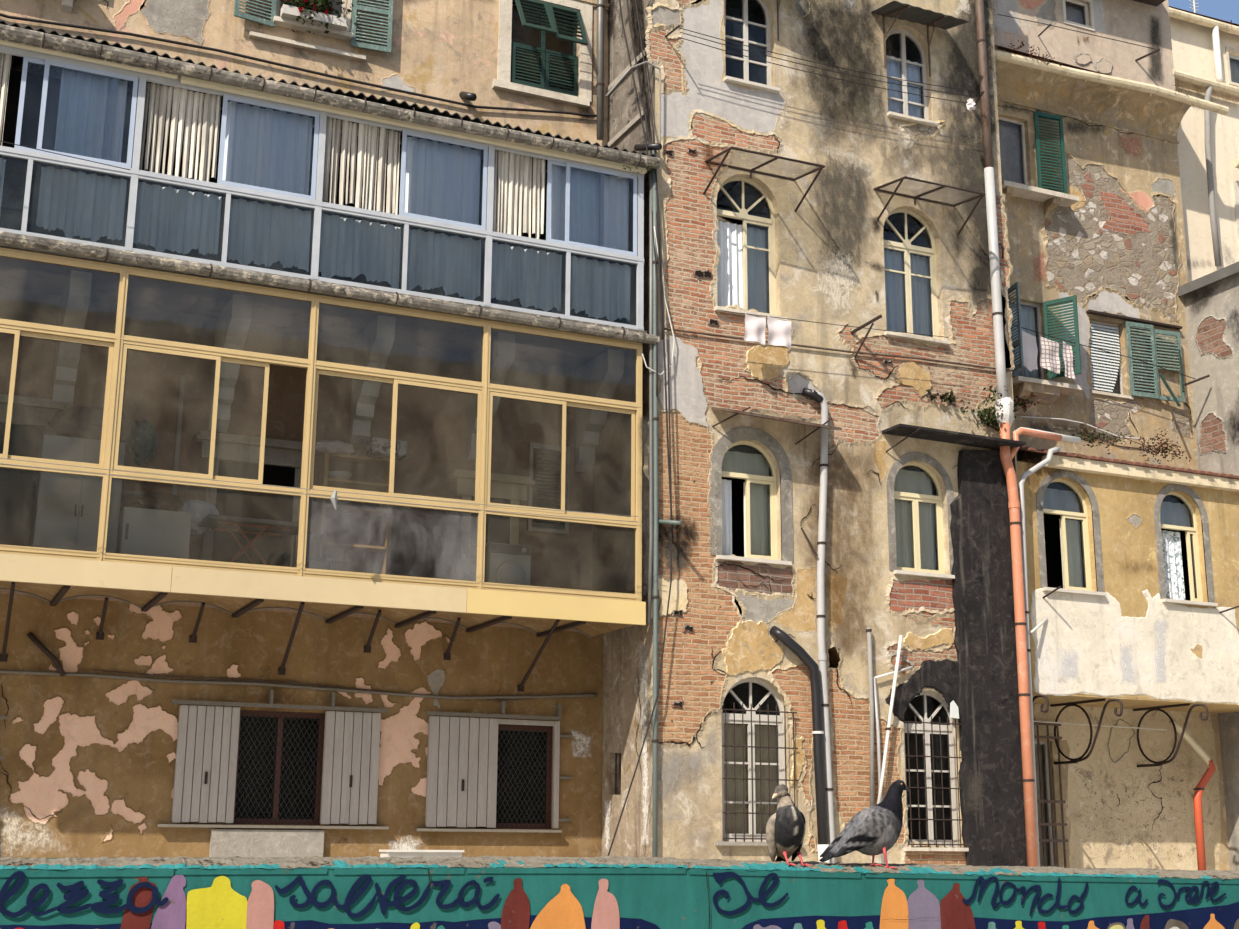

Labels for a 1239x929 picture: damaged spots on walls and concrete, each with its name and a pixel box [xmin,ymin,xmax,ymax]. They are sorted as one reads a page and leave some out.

flaking render [645,22,689,95]
water stain [804,1,877,123]
water stain [943,0,1021,306]
water stain [814,159,870,270]
flaking render [1067,186,1154,237]
flaking render [643,109,1015,749]
water stain [1228,413,1239,442]
peeling [8,601,184,844]
peeling [225,663,243,679]
peeling [336,619,457,799]
crack [635,676,717,777]
peeling [1190,644,1203,658]